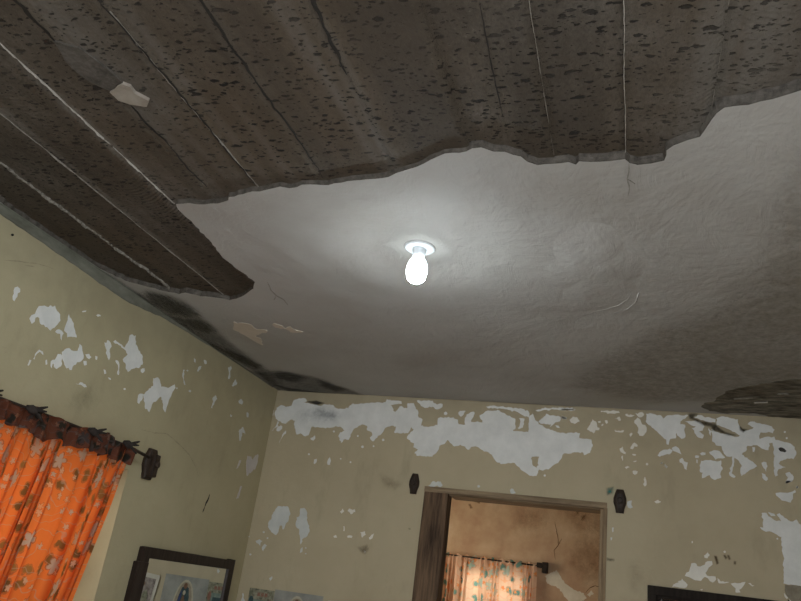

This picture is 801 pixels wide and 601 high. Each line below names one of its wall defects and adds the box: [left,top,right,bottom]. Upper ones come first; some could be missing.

spalling [0,0,801,296]
peeling [28,305,145,380]
peeling [137,358,207,412]
water stain [145,294,347,405]
peeling [272,379,801,503]
peeling [249,506,310,554]
peeling [760,512,801,601]